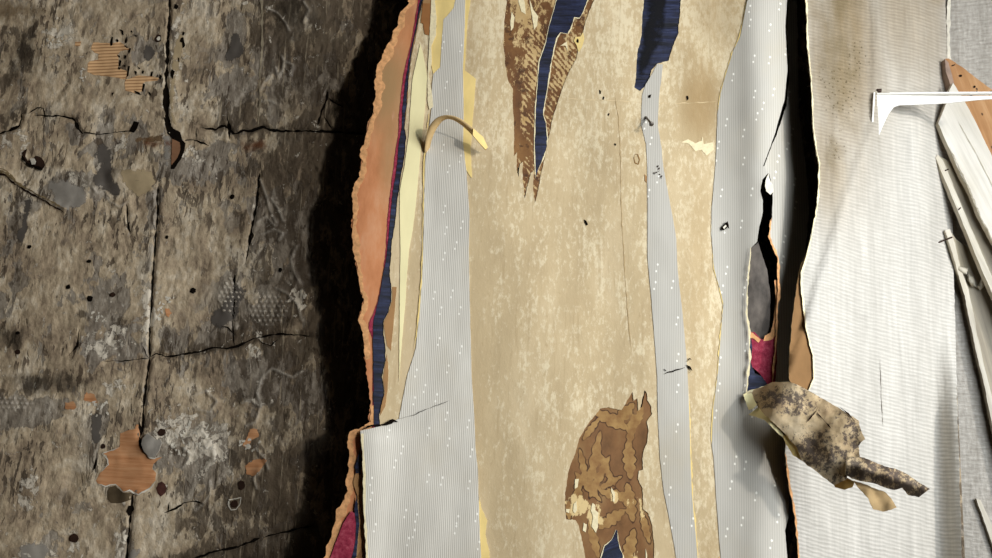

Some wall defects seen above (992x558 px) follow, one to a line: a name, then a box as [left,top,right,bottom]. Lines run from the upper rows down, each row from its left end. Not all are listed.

peeling [510,0,538,30]
spalling [46,30,183,125]
crack [163,0,365,146]
crack [0,107,127,135]
peeling [424,115,488,153]
crack [105,173,307,435]
spalling [65,392,216,503]
peeling [743,382,929,512]
crack [125,494,134,558]
crack [165,501,203,513]
crack [194,525,313,558]
peeling [583,503,598,532]